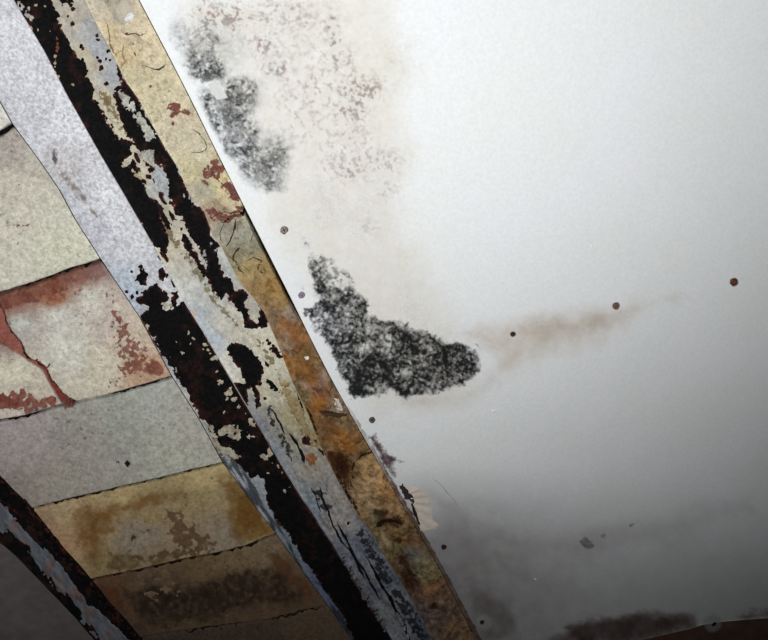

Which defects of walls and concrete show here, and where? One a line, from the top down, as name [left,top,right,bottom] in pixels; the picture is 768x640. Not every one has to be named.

peeling [167,103,190,126]
water stain [189,37,286,190]
peeling [202,159,245,223]
crack [0,258,101,399]
peeling [106,288,164,388]
rust [0,0,391,640]
peeling [162,222,238,326]
water stain [304,257,479,398]
peeling [0,389,73,414]
peeling [0,503,128,640]
water stain [105,509,311,622]
rust [375,510,403,543]